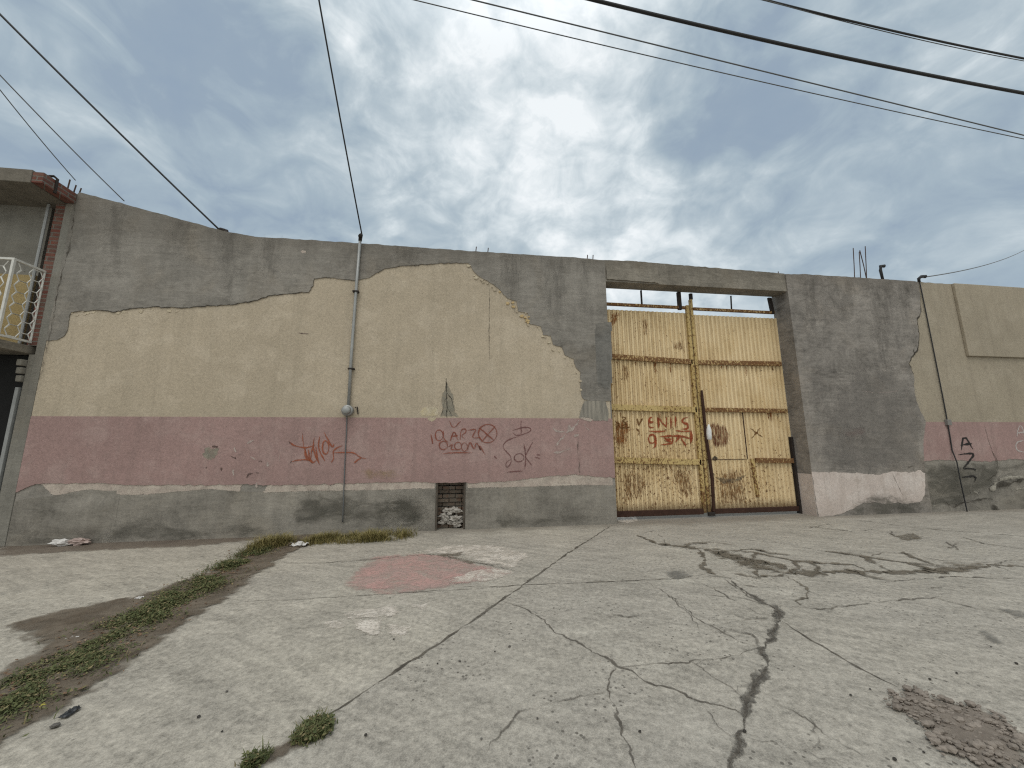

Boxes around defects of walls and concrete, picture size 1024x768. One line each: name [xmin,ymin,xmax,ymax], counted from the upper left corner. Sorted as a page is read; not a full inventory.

flaking render [419,384,458,422]
corrosion [614,413,631,445]
corrosion [710,424,730,447]
corrosion [620,465,649,502]
corrosion [665,465,693,497]
corrosion [716,469,769,505]
crack [489,525,1024,768]